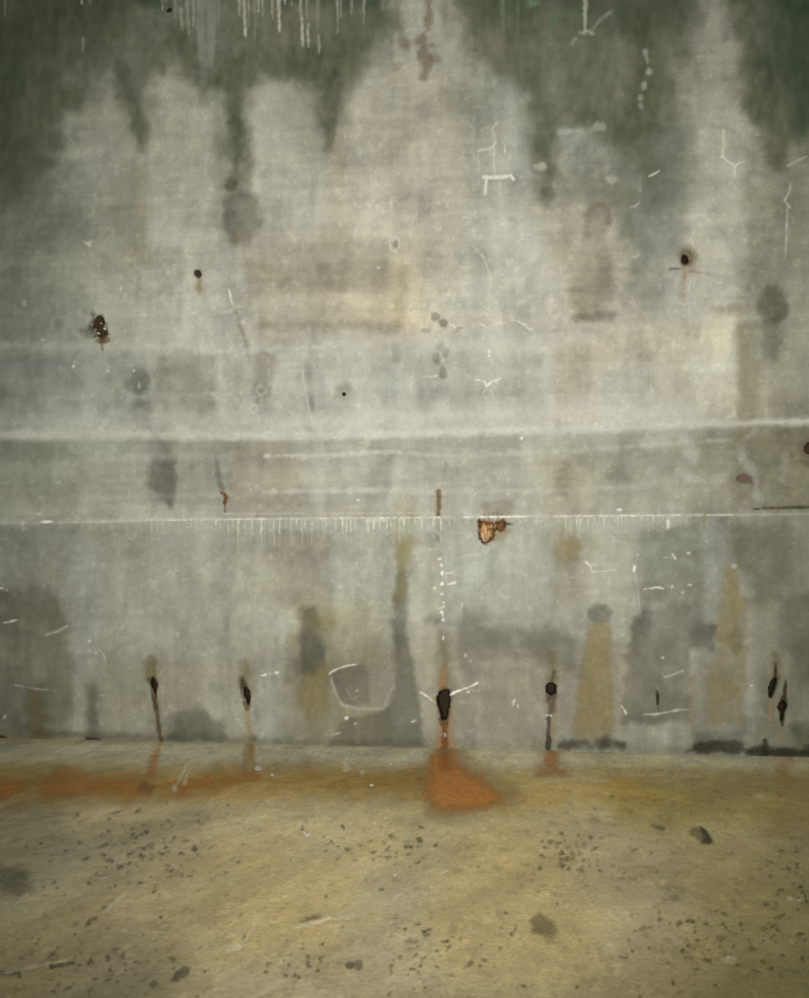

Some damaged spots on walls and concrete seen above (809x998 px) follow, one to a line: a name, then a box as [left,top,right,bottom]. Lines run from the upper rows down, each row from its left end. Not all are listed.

damp [238,0,247,37]
damp [258,0,286,32]
damp [300,0,309,47]
corrosion [423,750,509,811]